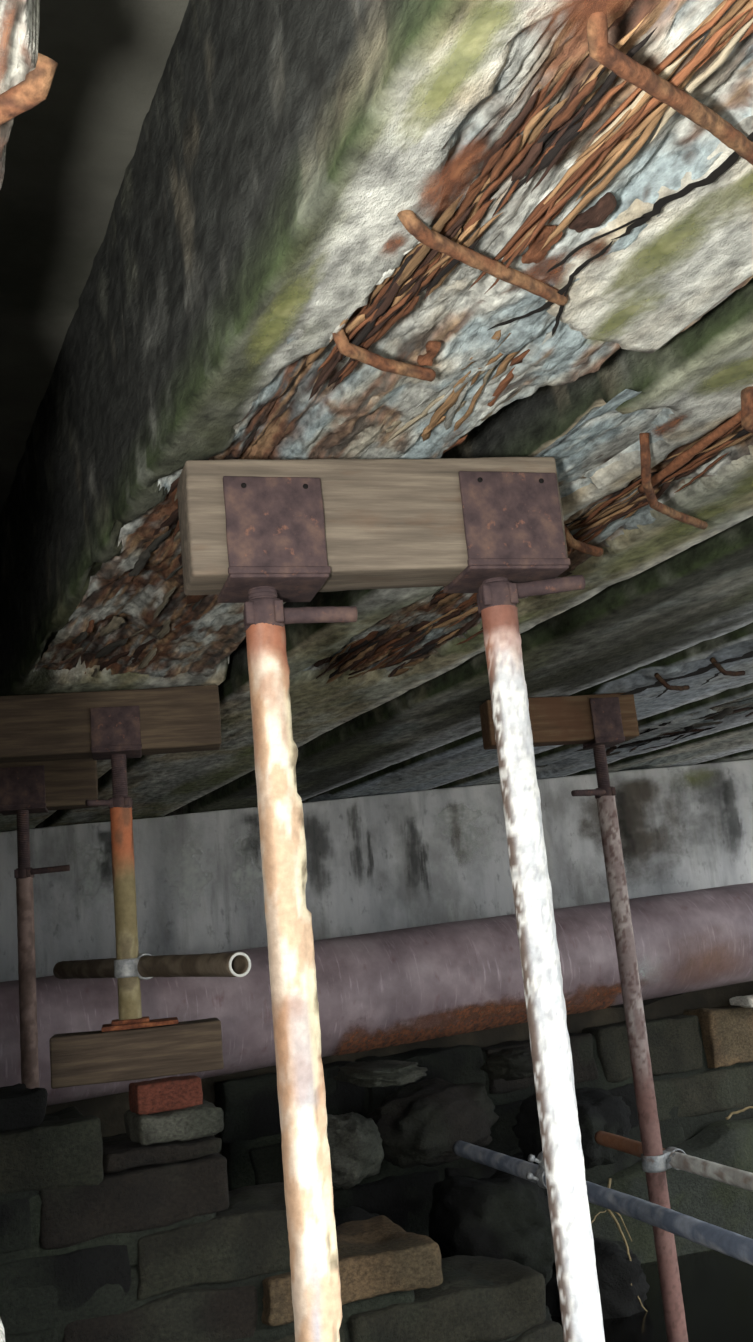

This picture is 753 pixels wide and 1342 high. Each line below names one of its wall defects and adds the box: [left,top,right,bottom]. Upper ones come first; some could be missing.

rust [550,0,620,29]
rust [614,13,657,58]
spalling [607,0,753,127]
rust [653,0,753,95]
spalling [209,10,723,460]
rust [306,62,677,401]
crack [488,132,753,336]
spalling [534,389,753,578]
spalling [33,469,246,679]
water stain [305,818,329,879]
water stain [615,780,678,871]
water stain [707,774,742,848]